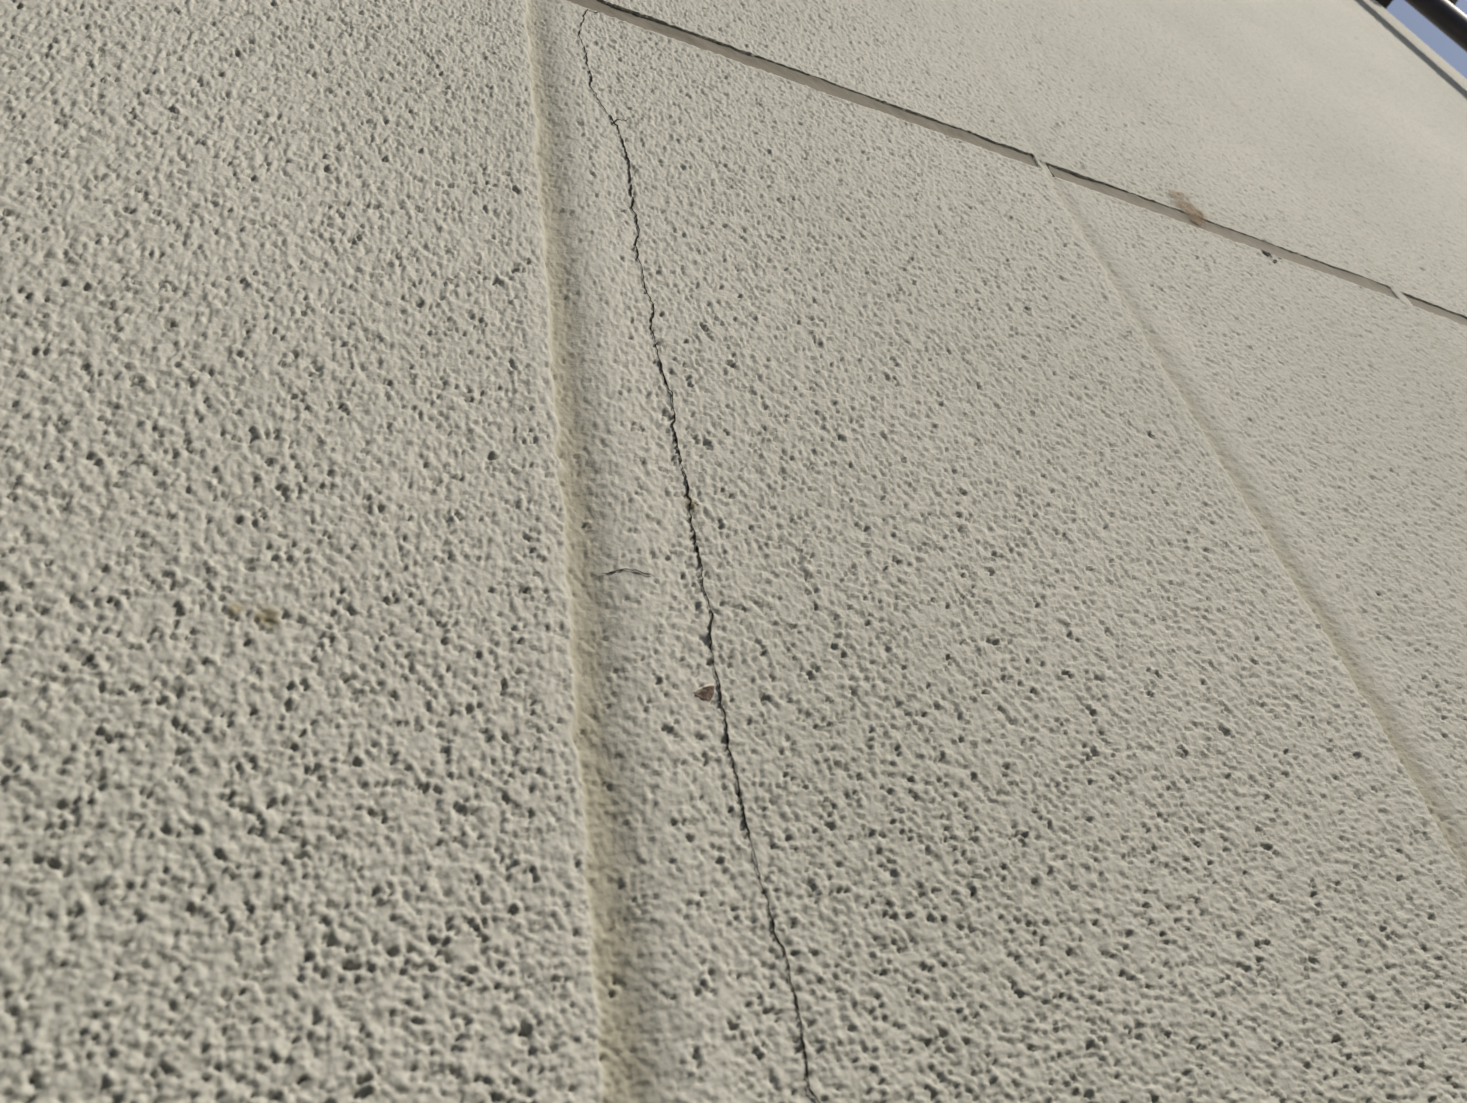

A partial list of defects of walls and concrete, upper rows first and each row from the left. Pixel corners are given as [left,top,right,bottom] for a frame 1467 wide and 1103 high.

crack [578,9,820,1103]